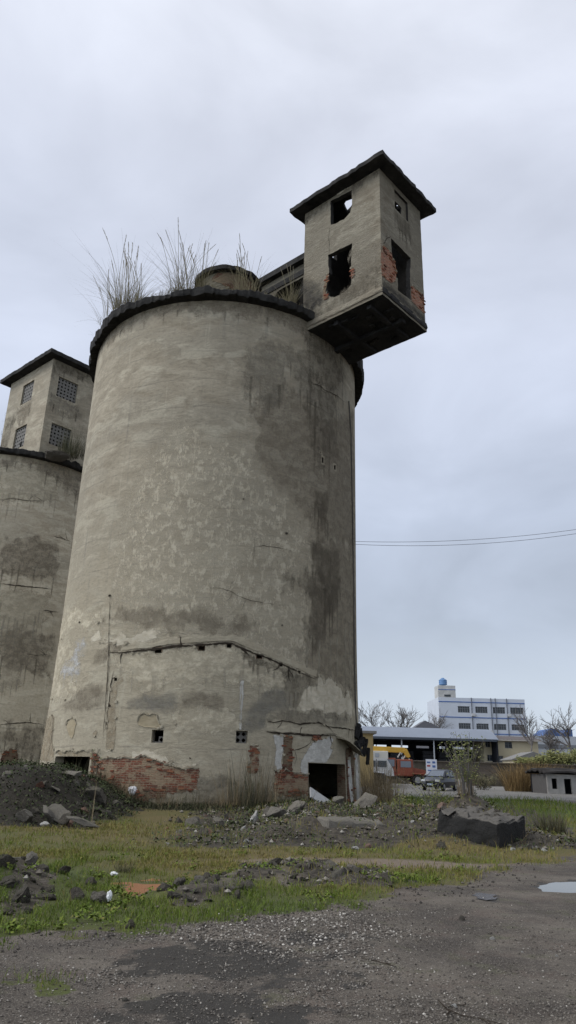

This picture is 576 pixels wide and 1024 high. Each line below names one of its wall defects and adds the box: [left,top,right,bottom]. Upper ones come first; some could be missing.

spalling [380,244,397,283]
spalling [411,284,426,314]
peeling [40,424,313,803]
crack [103,632,317,731]
spalling [273,734,333,799]
crack [267,720,353,760]